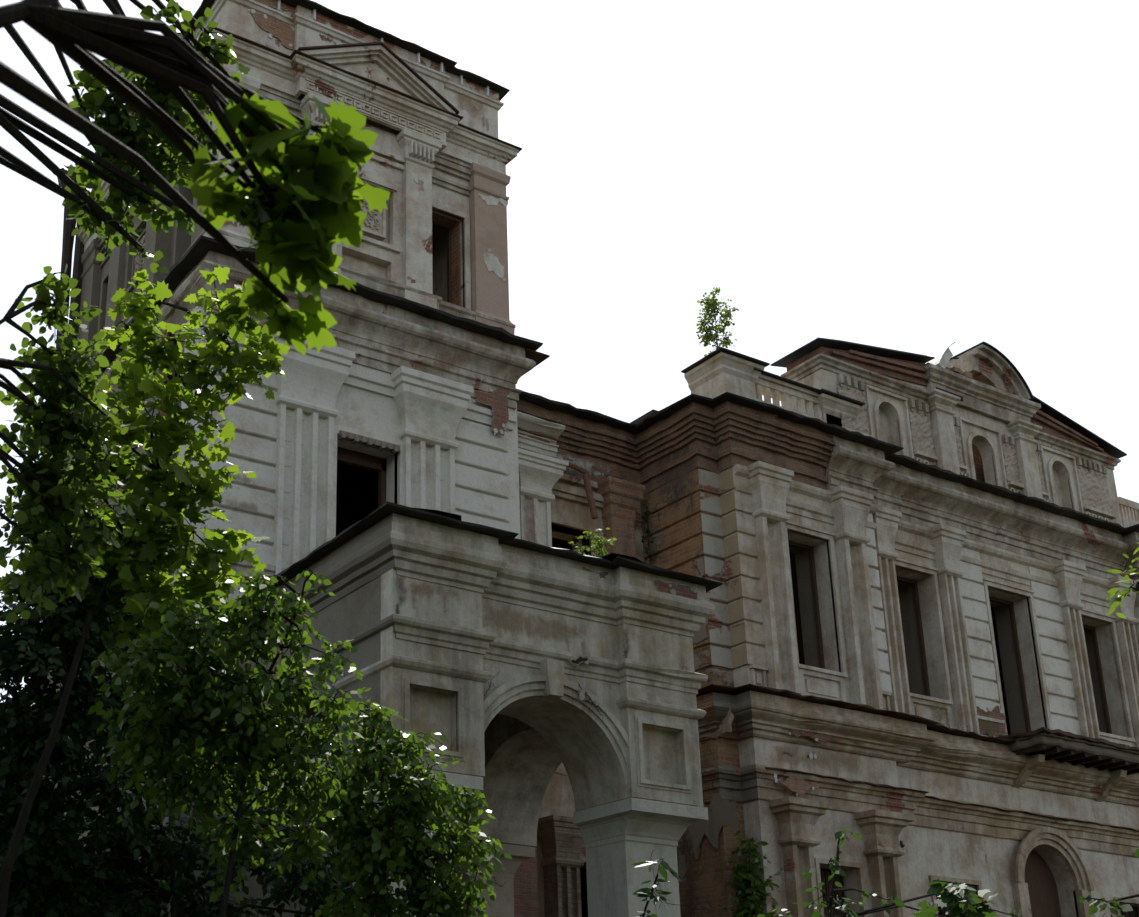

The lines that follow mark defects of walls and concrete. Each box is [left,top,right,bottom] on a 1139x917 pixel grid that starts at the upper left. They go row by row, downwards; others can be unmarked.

flaking render [248,0,295,49]
flaking render [473,387,511,436]
flaking render [772,774,821,795]